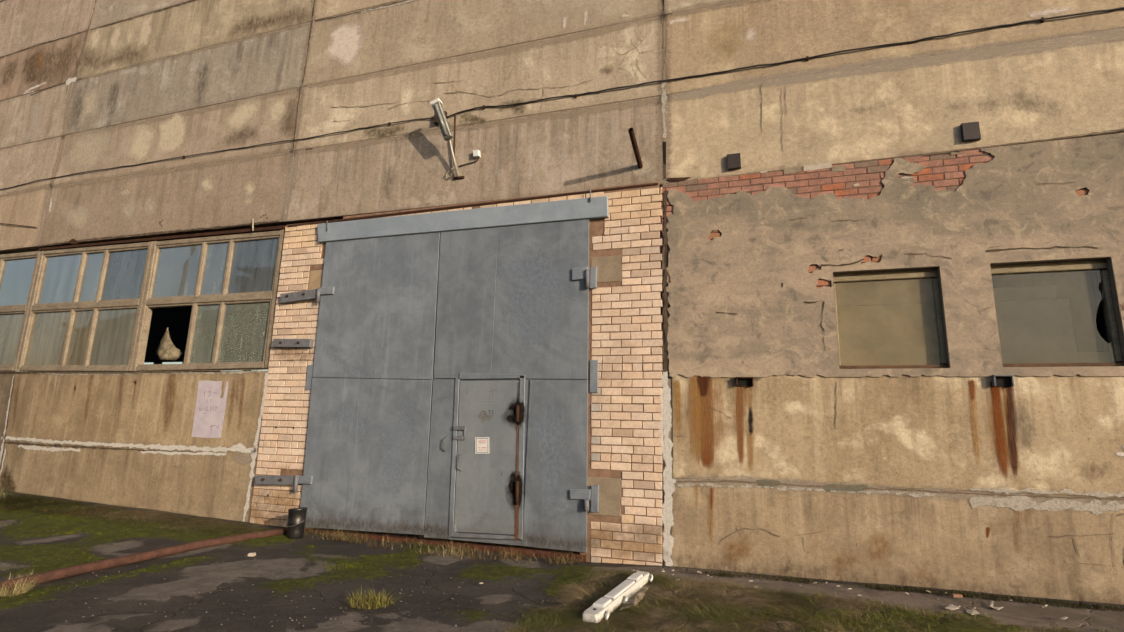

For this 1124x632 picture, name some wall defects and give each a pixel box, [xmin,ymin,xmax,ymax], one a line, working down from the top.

leakage [3,47,138,84]
crack [331,79,593,122]
crack [612,29,654,82]
flaking render [661,149,994,231]
flaking render [808,264,831,289]
flaking render [861,255,882,264]
corrosion [674,376,714,466]
corrosion [736,386,754,468]
corrosion [969,380,979,458]
corrosion [990,382,1018,475]